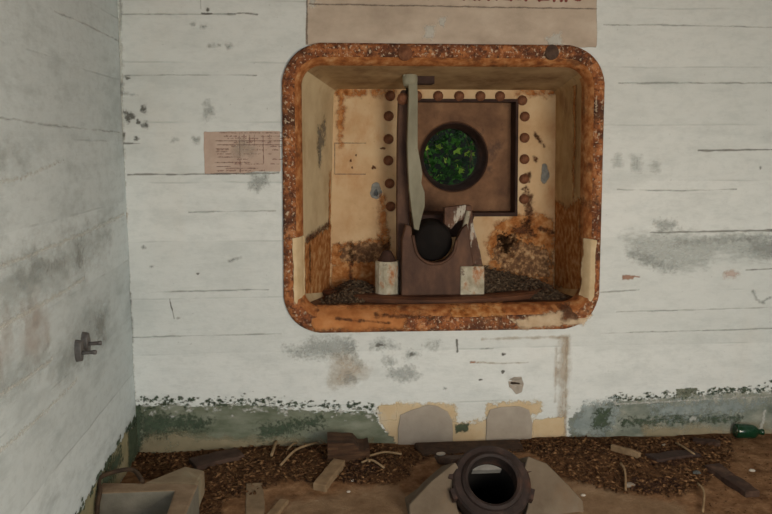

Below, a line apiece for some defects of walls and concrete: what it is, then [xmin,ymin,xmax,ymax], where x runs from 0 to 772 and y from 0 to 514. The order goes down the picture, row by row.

rust [336,89,395,147]
rust [305,176,391,294]
rust [487,85,582,289]
rust [311,306,434,331]
peeling [75,370,772,514]